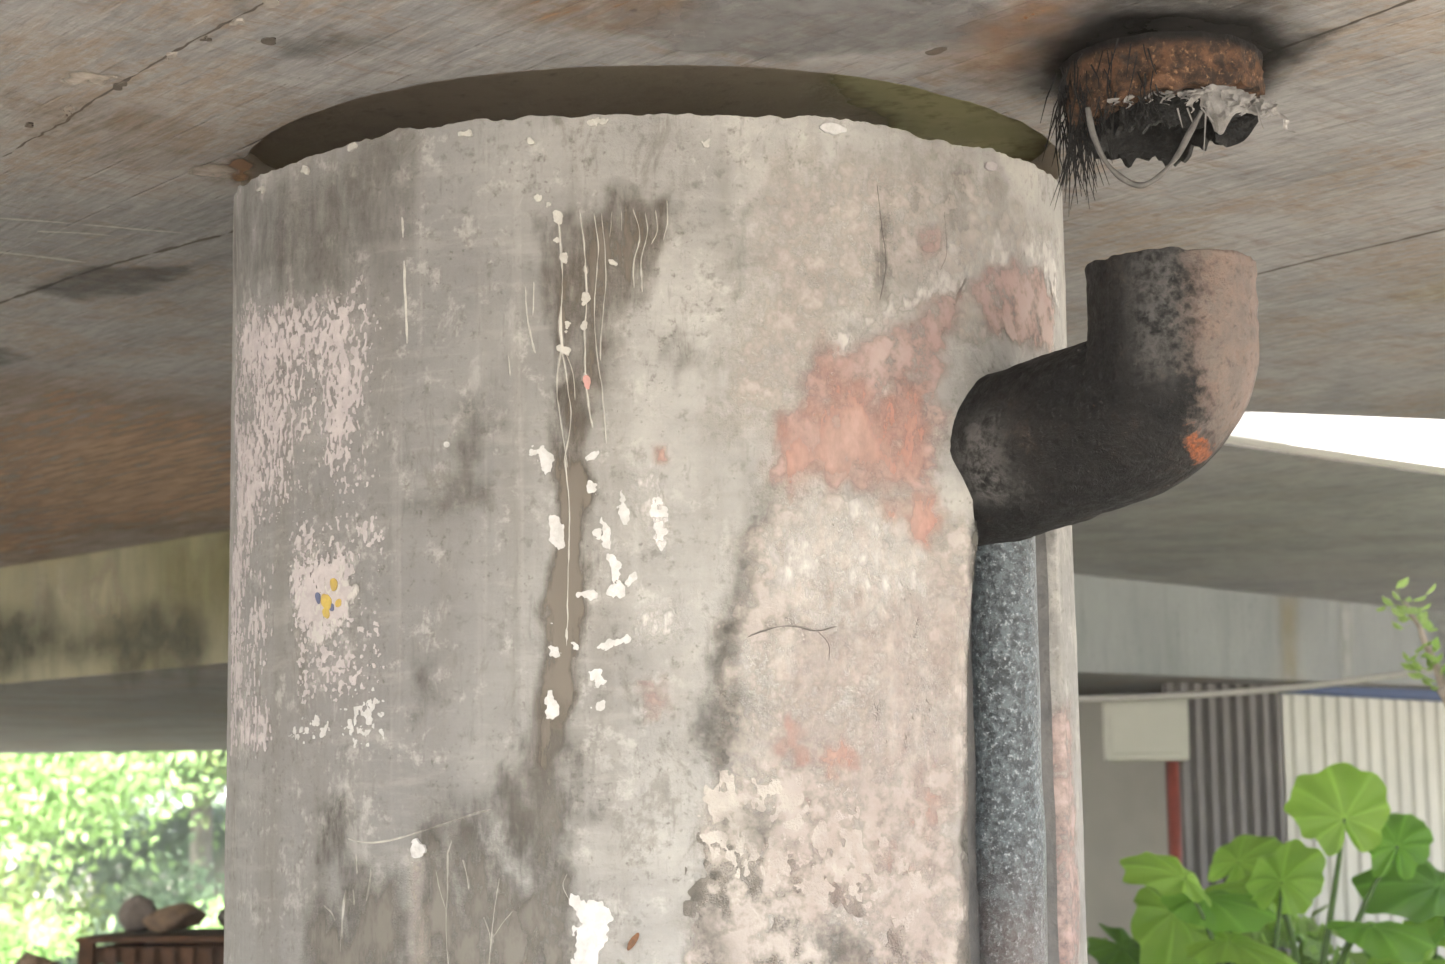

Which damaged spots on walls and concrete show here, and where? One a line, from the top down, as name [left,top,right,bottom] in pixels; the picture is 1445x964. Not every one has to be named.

peeling [529,445,555,475]
peeling [229,275,385,758]
peeling [549,515,565,550]
peeling [576,490,637,601]
peeling [650,497,668,551]
leakage [306,191,668,964]
leakage [0,560,202,671]
peeling [548,642,579,658]
peeling [597,634,631,651]
peeling [544,690,559,719]
peeling [588,669,607,711]
flaking render [683,491,968,964]